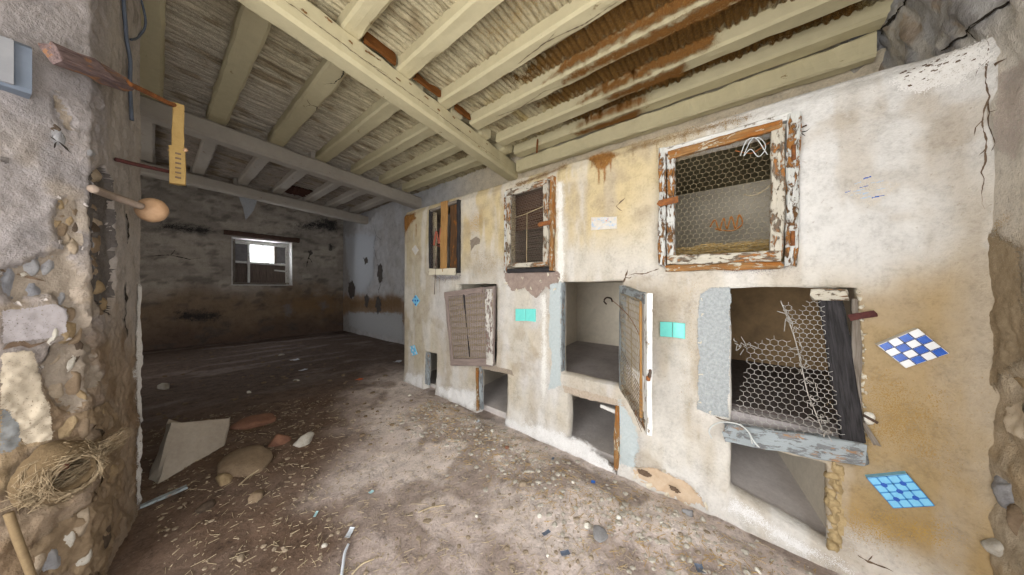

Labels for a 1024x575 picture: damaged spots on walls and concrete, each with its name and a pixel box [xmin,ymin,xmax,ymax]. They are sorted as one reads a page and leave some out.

rust [587,150,618,185]
rust [541,0,745,136]
crack [880,0,907,34]
crack [938,0,1010,207]
spalling [363,257,383,283]
peeling [504,270,708,511]